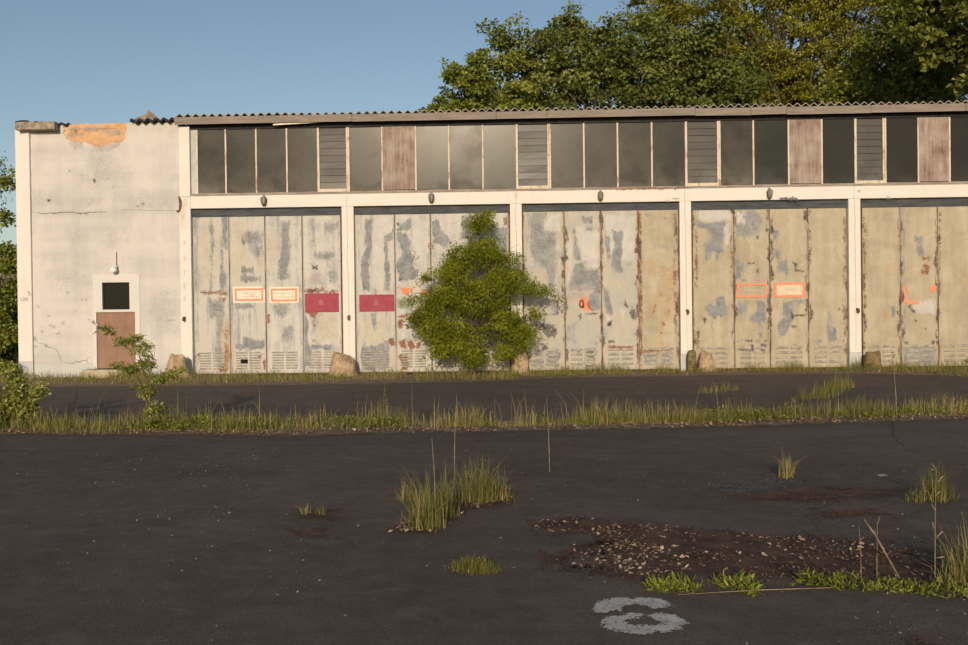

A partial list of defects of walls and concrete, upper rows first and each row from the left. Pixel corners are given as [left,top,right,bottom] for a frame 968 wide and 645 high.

spalling [64,123,127,153]
crack [37,210,102,218]
peeling [192,217,291,368]
peeling [269,303,341,367]
peeling [308,218,339,284]
rust [389,313,420,373]
peeling [360,215,471,310]
peeling [522,210,680,368]
rust [607,211,680,367]
peeling [691,209,814,352]
peeling [793,307,848,354]
peeling [886,196,941,367]